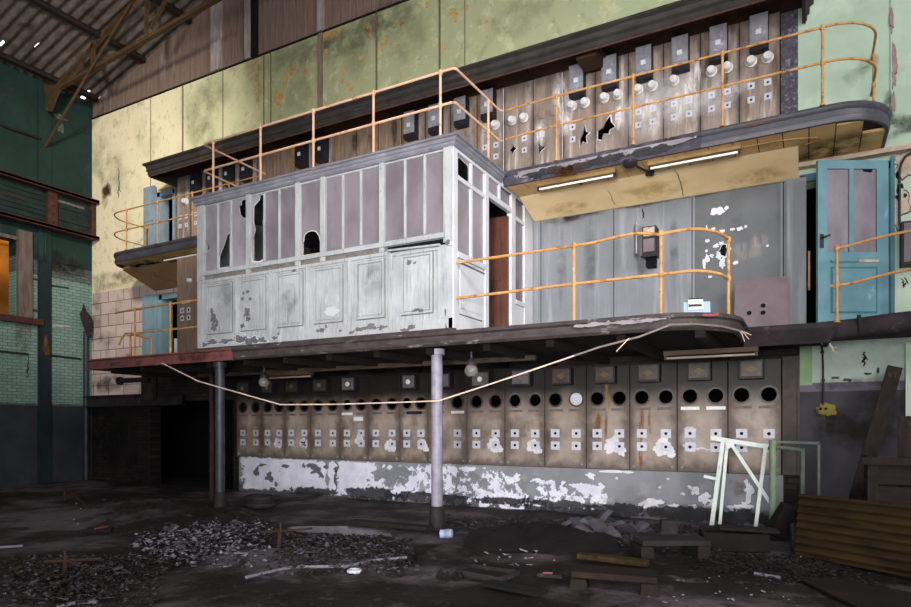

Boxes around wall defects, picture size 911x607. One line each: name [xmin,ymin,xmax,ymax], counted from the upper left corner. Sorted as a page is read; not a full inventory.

peeling [514,136,697,178]
peeling [710,206,729,216]
peeling [702,225,747,278]
peeling [201,290,280,348]
peeling [316,306,340,333]
peeling [240,456,431,503]
spalling [443,464,769,526]